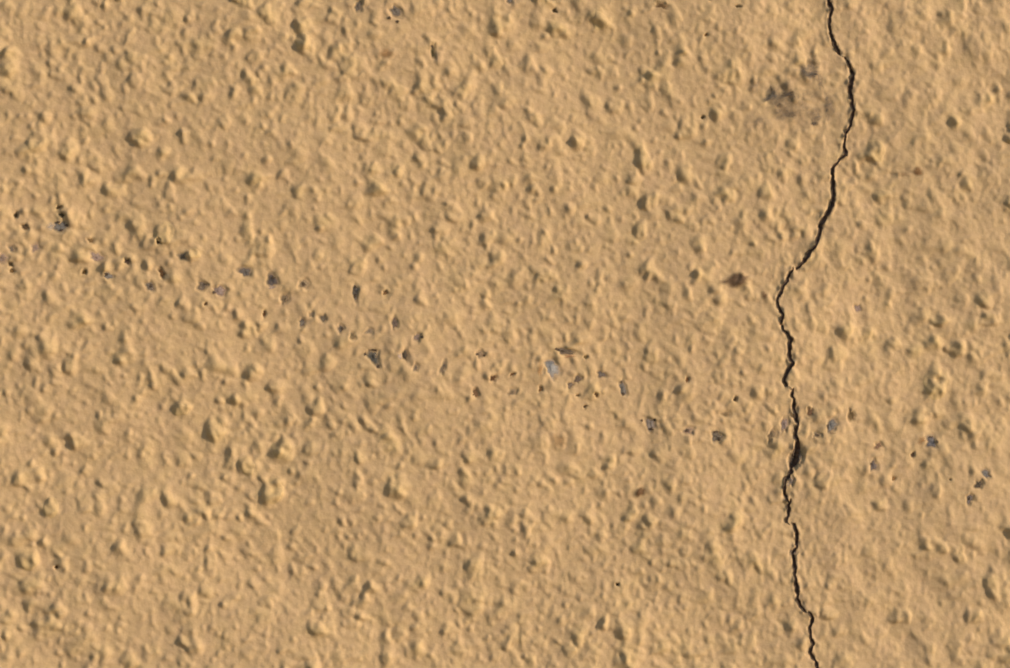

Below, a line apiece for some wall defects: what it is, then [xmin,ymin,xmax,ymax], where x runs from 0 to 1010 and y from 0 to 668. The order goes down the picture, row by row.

crack [776,0,855,668]